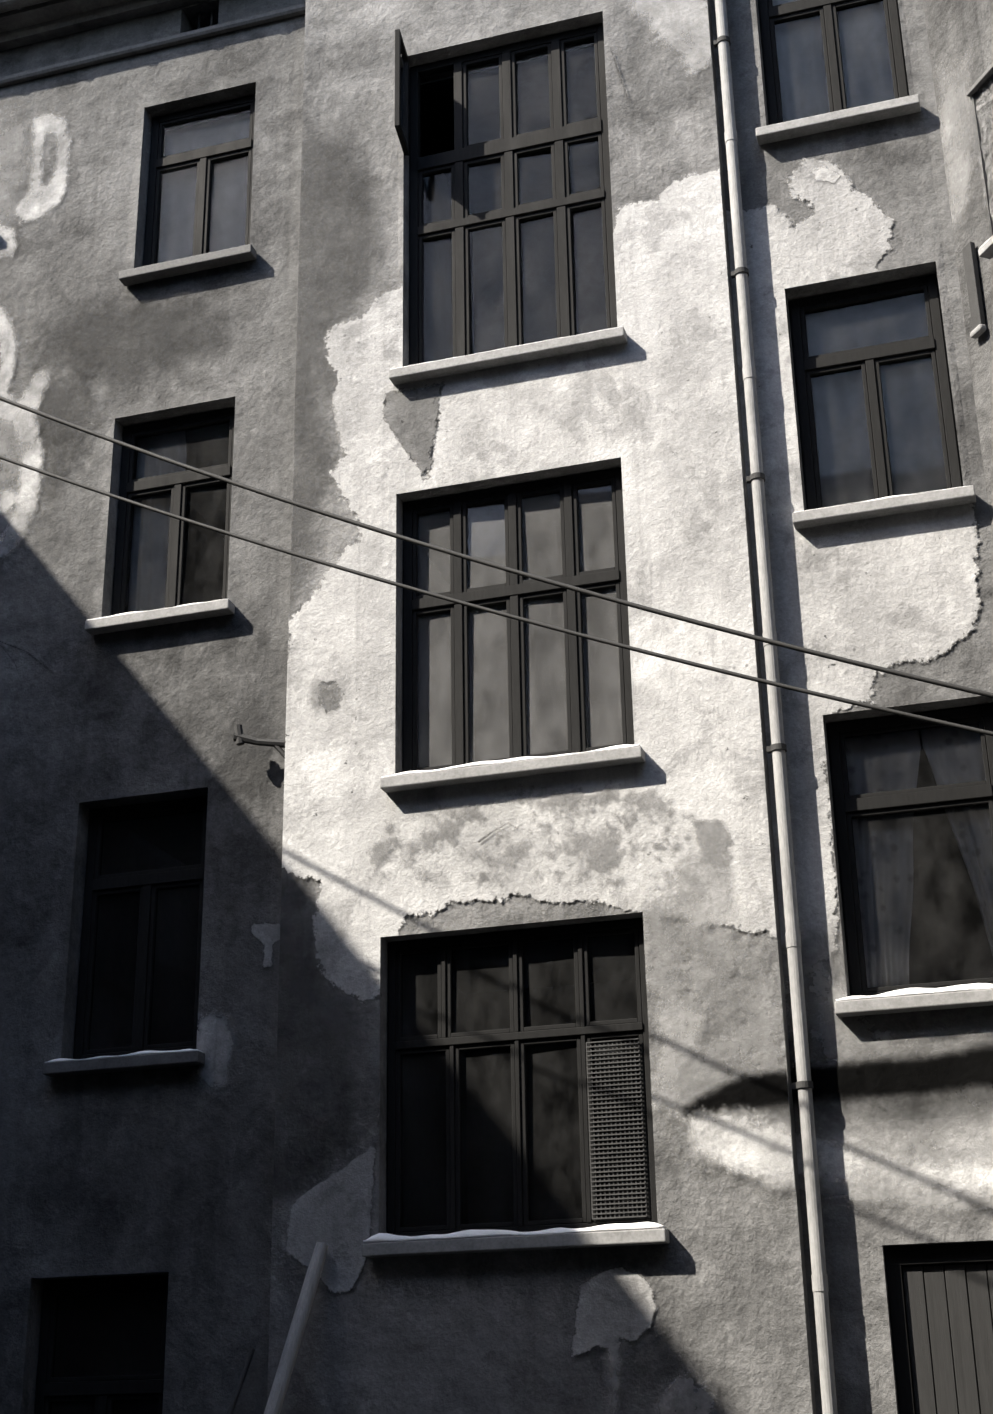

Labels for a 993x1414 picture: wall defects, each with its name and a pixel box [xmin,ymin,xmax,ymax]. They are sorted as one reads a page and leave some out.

peeling [633,0,711,73]
peeling [282,158,981,1004]
water stain [371,807,485,876]
flaking render [251,922,280,968]
water stain [512,786,987,1125]
flaking render [195,1013,234,1087]
peeling [285,1145,376,1294]
flaking render [570,1267,656,1414]